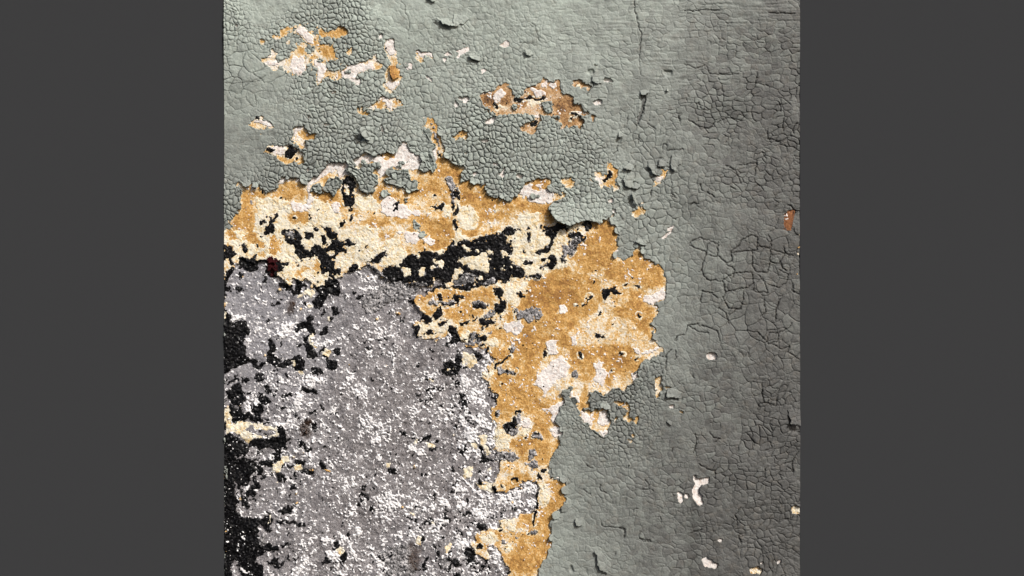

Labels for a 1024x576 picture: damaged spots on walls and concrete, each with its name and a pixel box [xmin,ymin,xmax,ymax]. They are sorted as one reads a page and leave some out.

crack [616,97,796,215]
peeling [791,210,800,255]
flaking render [224,23,683,576]
crack [650,235,798,385]
peeling [677,475,709,506]